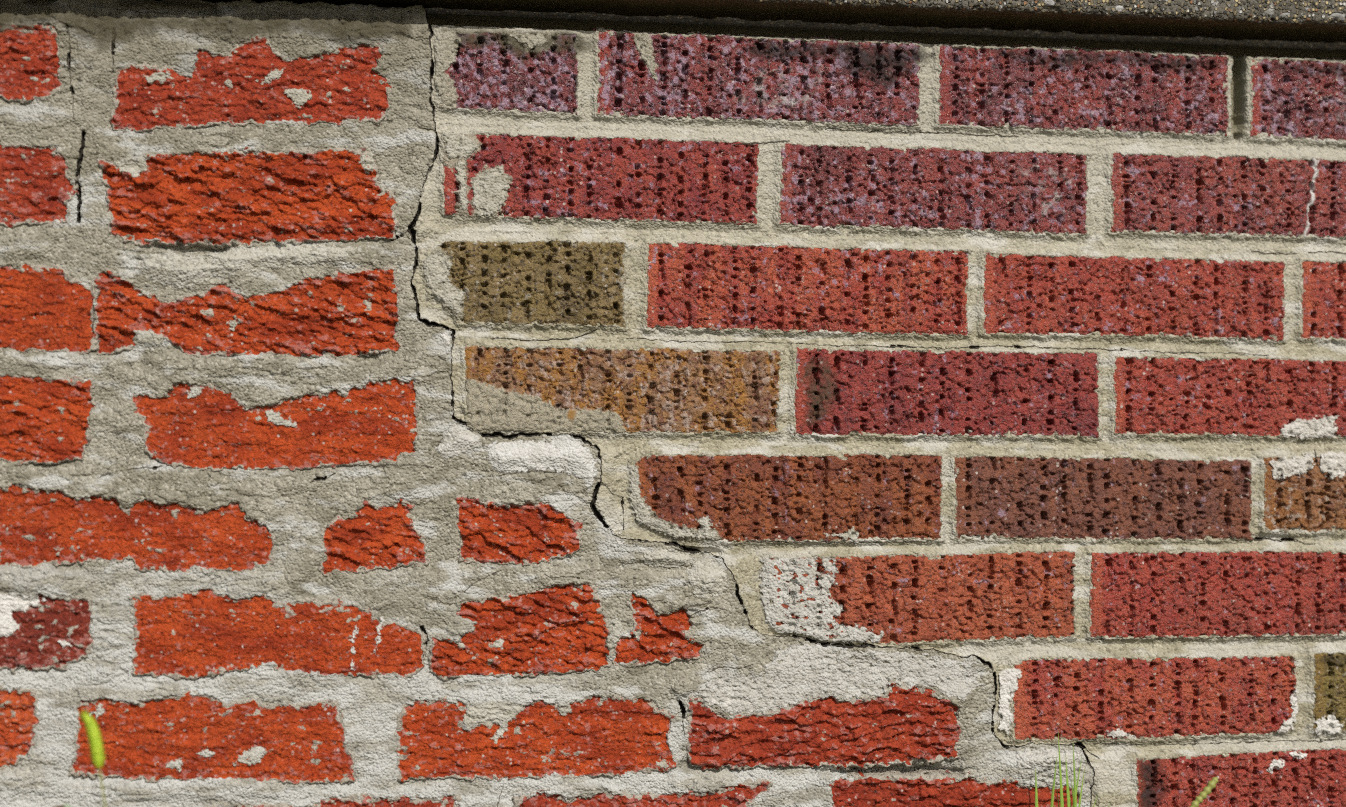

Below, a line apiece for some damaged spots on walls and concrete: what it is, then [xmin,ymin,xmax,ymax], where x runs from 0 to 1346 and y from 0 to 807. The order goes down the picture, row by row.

crack [65,20,85,222]
crack [303,8,1346,807]
spalling [693,556,981,718]